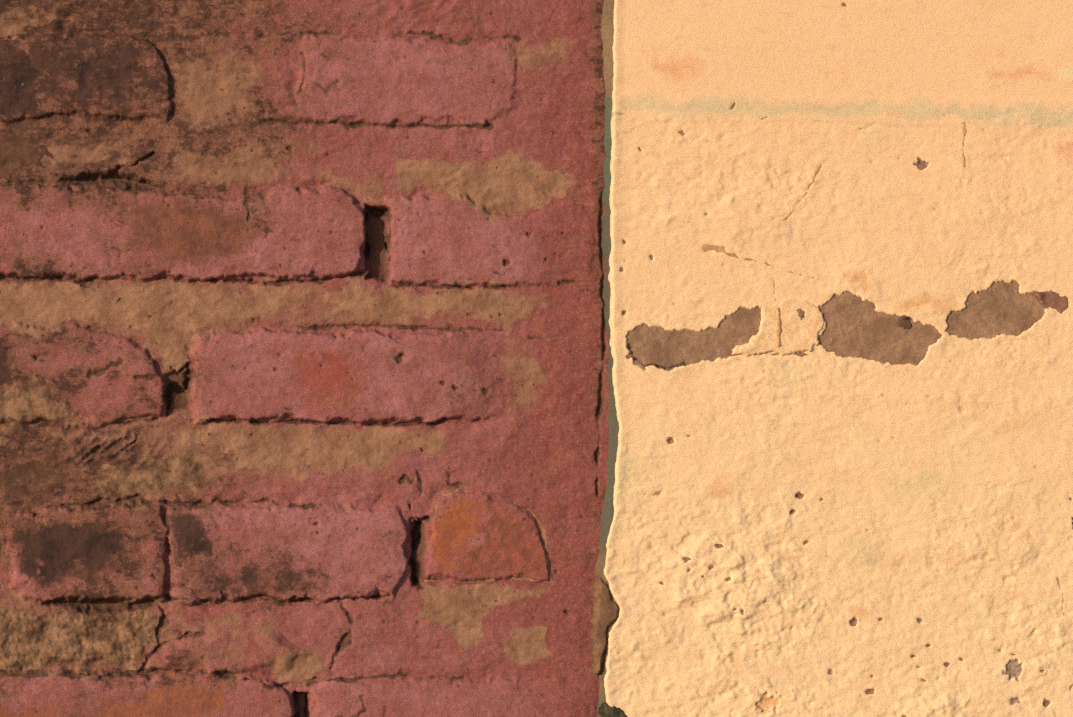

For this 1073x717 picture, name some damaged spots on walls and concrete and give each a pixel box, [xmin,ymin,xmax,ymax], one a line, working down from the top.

spalling [914,157,929,170]
peeling [626,280,1068,371]
peeling [590,0,627,717]
spalling [1003,659,1023,682]
spalling [755,692,780,715]